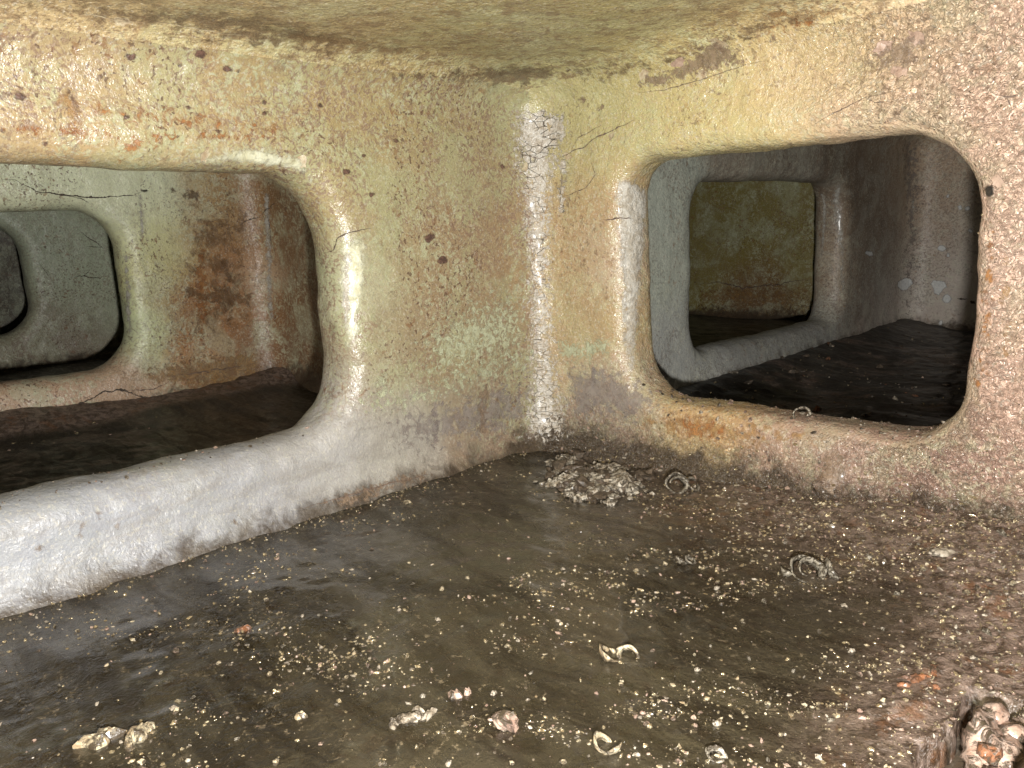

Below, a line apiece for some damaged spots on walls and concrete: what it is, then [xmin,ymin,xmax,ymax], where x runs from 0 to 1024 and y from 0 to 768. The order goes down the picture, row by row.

crack [517,111,633,196]
crack [3,179,148,203]
corrosion [187,216,250,335]
crack [78,366,240,404]
corrosion [643,412,802,449]